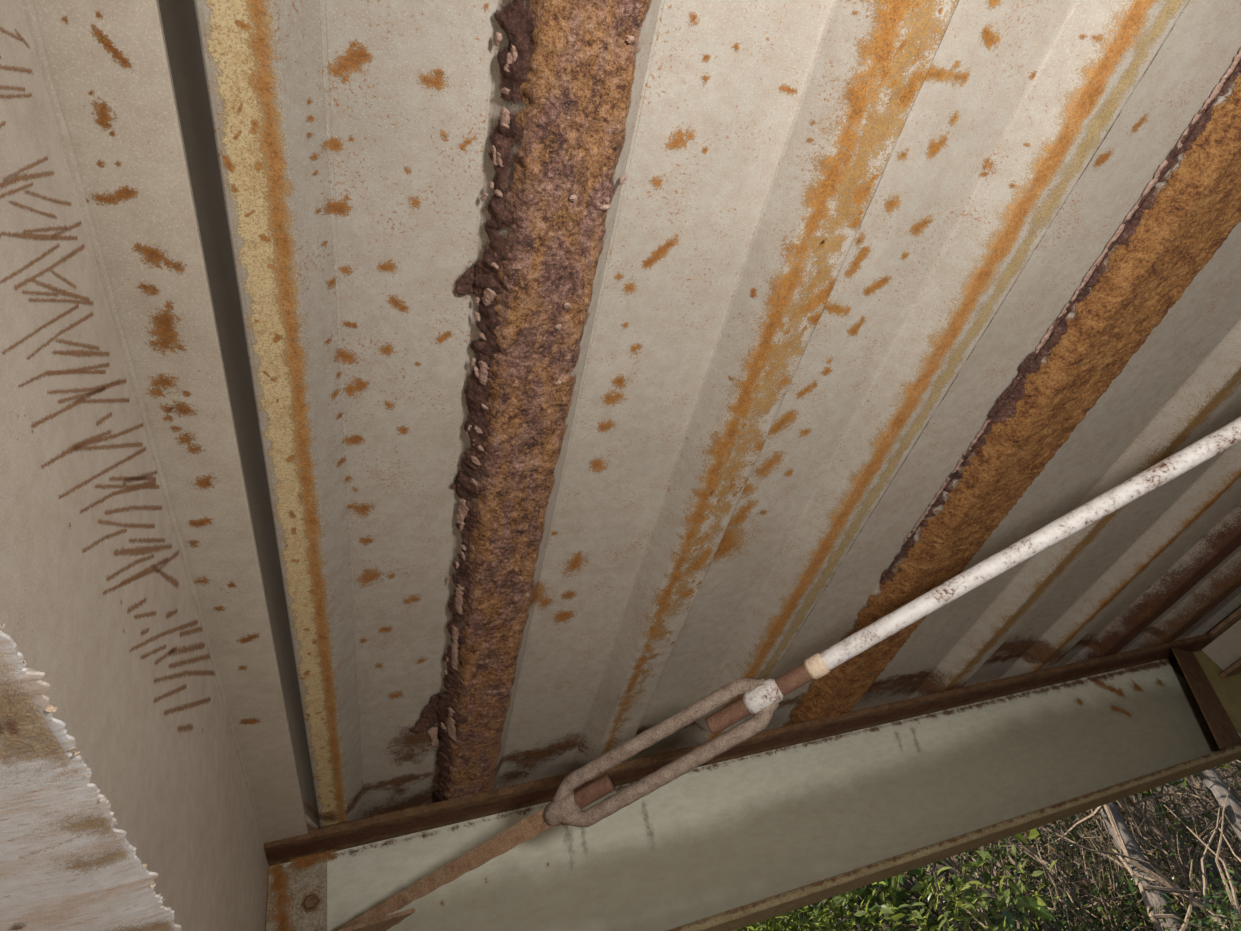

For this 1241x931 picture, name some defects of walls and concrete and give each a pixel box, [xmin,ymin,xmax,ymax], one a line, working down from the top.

corrosion [90,11,132,68]
peeling [493,31,518,72]
peeling [499,87,511,129]
peeling [492,144,504,167]
peeling [474,288,497,340]
corrosion [743,0,1190,680]
peeling [470,357,489,386]
corrosion [146,373,206,454]
corrosion [1134,366,1241,476]
peeling [466,425,484,487]
corrosion [233,0,970,931]
corrosion [691,469,1241,772]